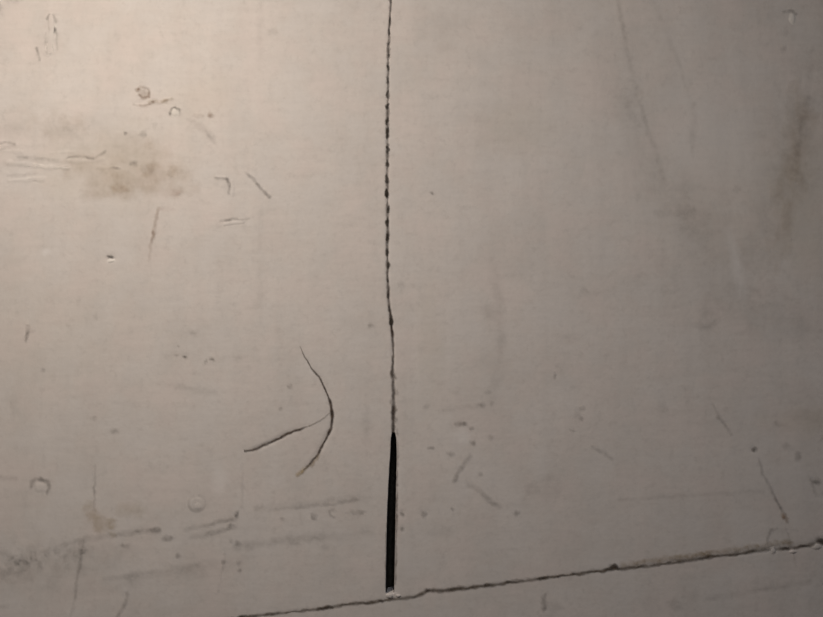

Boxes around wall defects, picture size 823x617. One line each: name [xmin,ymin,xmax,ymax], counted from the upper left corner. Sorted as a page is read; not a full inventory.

crack [240,4,823,617]